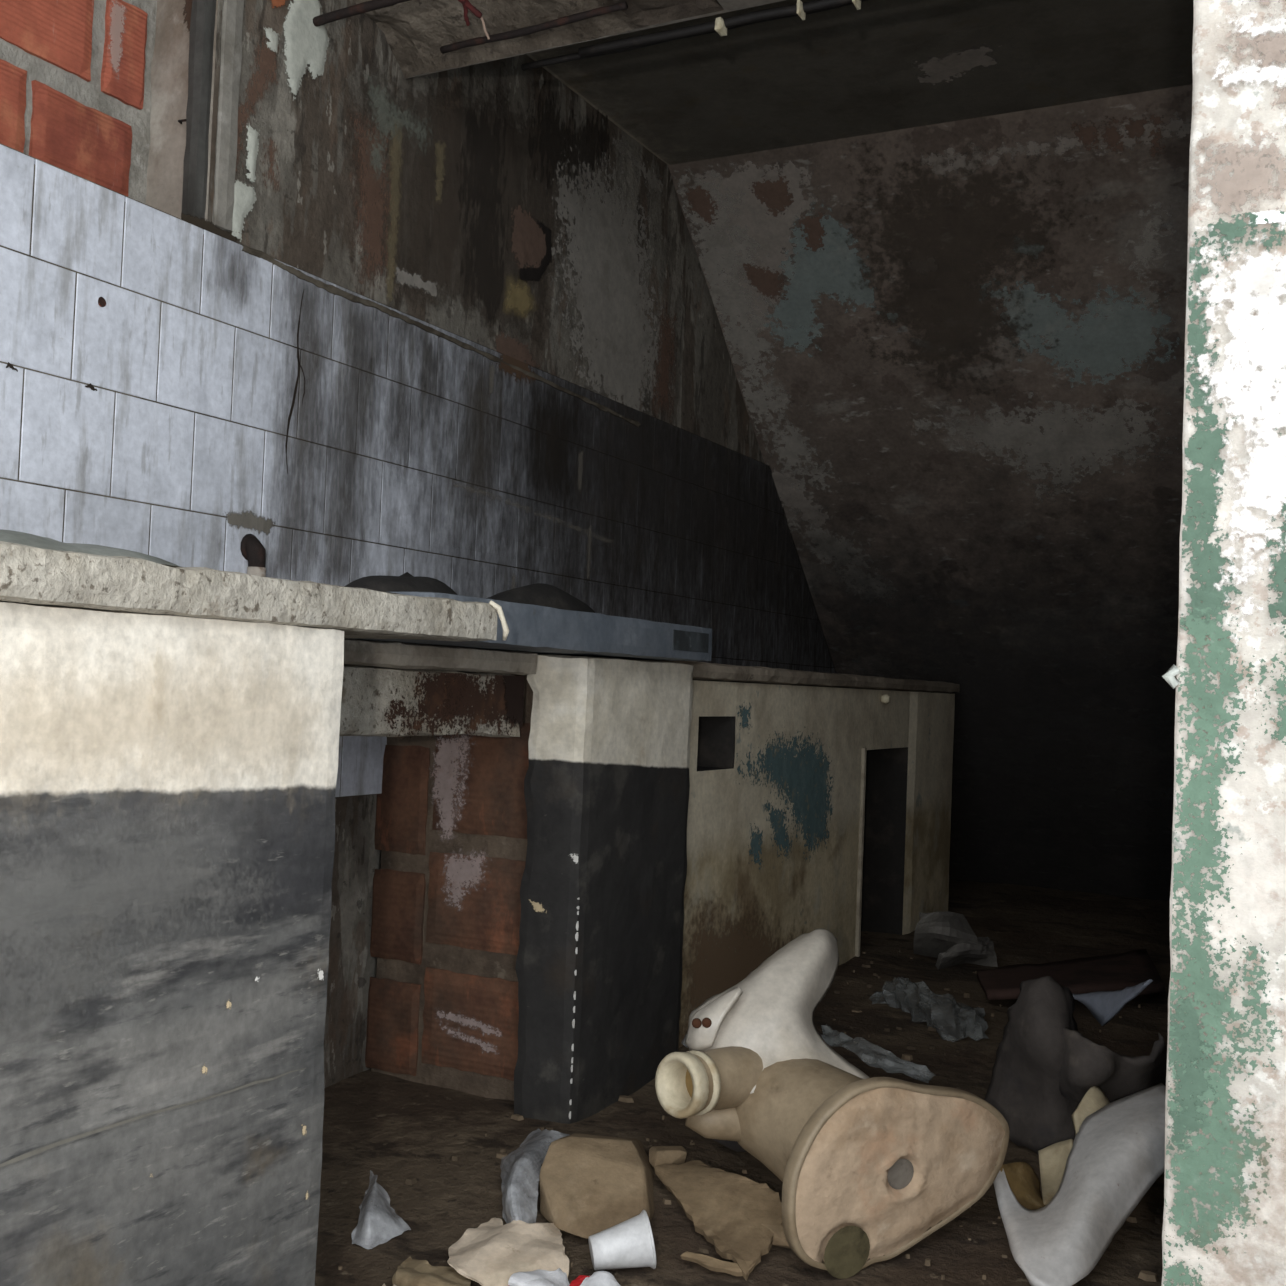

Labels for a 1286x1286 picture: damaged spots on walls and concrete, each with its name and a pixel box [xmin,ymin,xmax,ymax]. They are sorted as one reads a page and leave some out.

spalling [263,0,640,100]
leakage [1071,110,1166,157]
flaking render [1217,0,1286,82]
flaking render [1273,85,1286,109]
leakage [347,77,841,496]
leakage [845,149,1072,395]
leakage [333,309,377,575]
peeling [737,702,751,729]
peeling [911,112,1286,1286]
peeling [736,731,834,869]